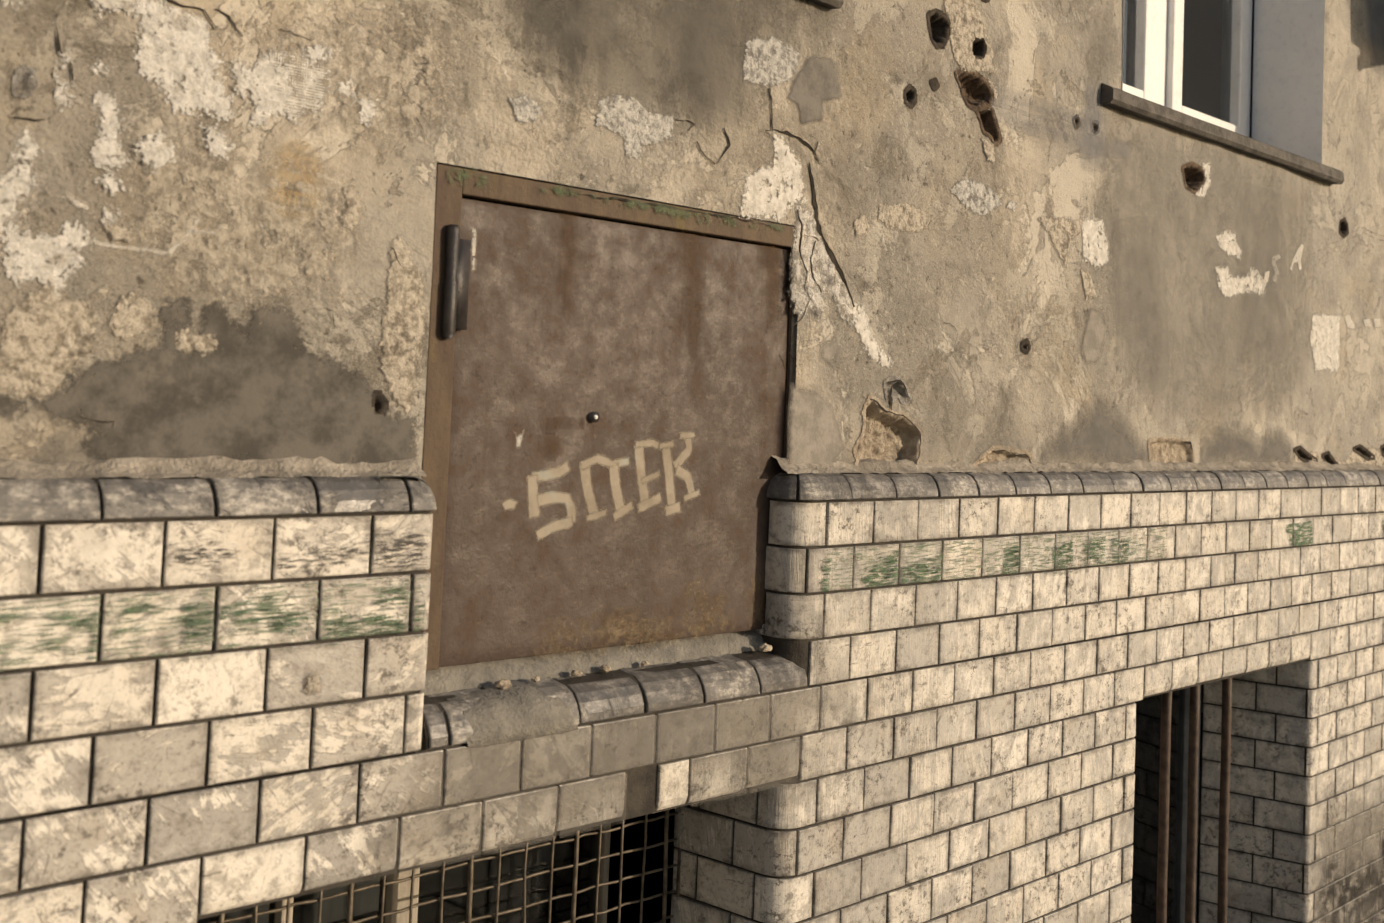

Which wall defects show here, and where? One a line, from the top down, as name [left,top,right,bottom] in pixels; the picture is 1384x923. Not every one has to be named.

flaking render [944,0,998,105]
flaking render [595,94,674,160]
flaking render [0,0,465,414]
crack [569,87,855,366]
spalling [739,134,932,466]
flaking render [951,179,1018,217]
flaking render [1038,216,1109,301]
peeling [1196,162,1211,197]
peeling [1215,229,1267,298]
damp [0,297,419,464]
peeling [1310,314,1341,372]
peeling [1292,444,1384,466]